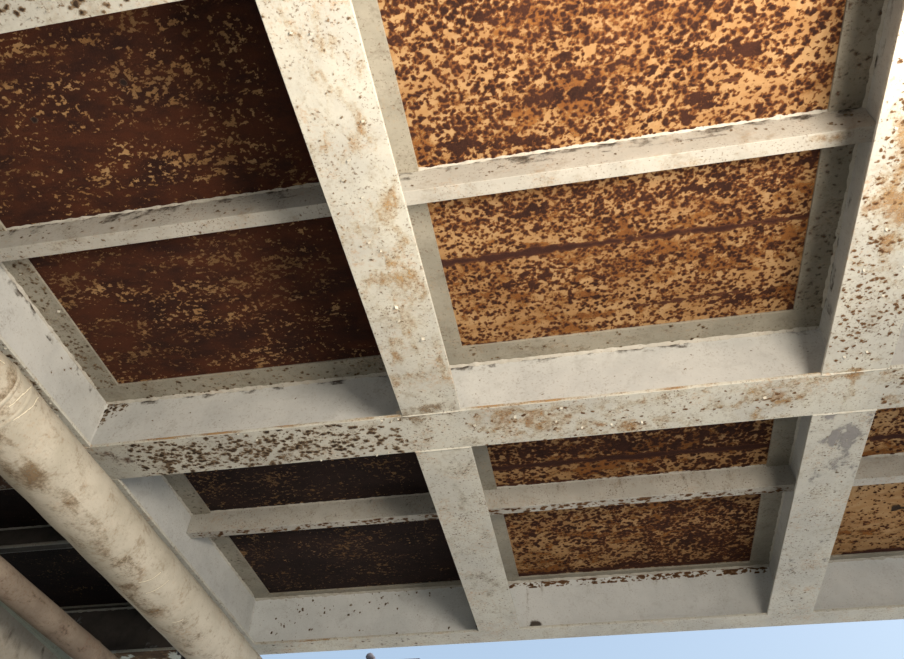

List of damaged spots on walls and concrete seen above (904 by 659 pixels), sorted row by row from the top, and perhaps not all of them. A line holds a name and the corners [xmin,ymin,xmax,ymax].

rust [378,0,865,176]
rust [0,0,426,398]
rust [428,149,841,361]
rust [829,83,904,384]
rust [88,391,451,512]
rust [193,508,462,647]
rust [450,381,808,487]
rust [479,487,788,601]
rust [806,482,904,555]
rust [860,370,904,457]